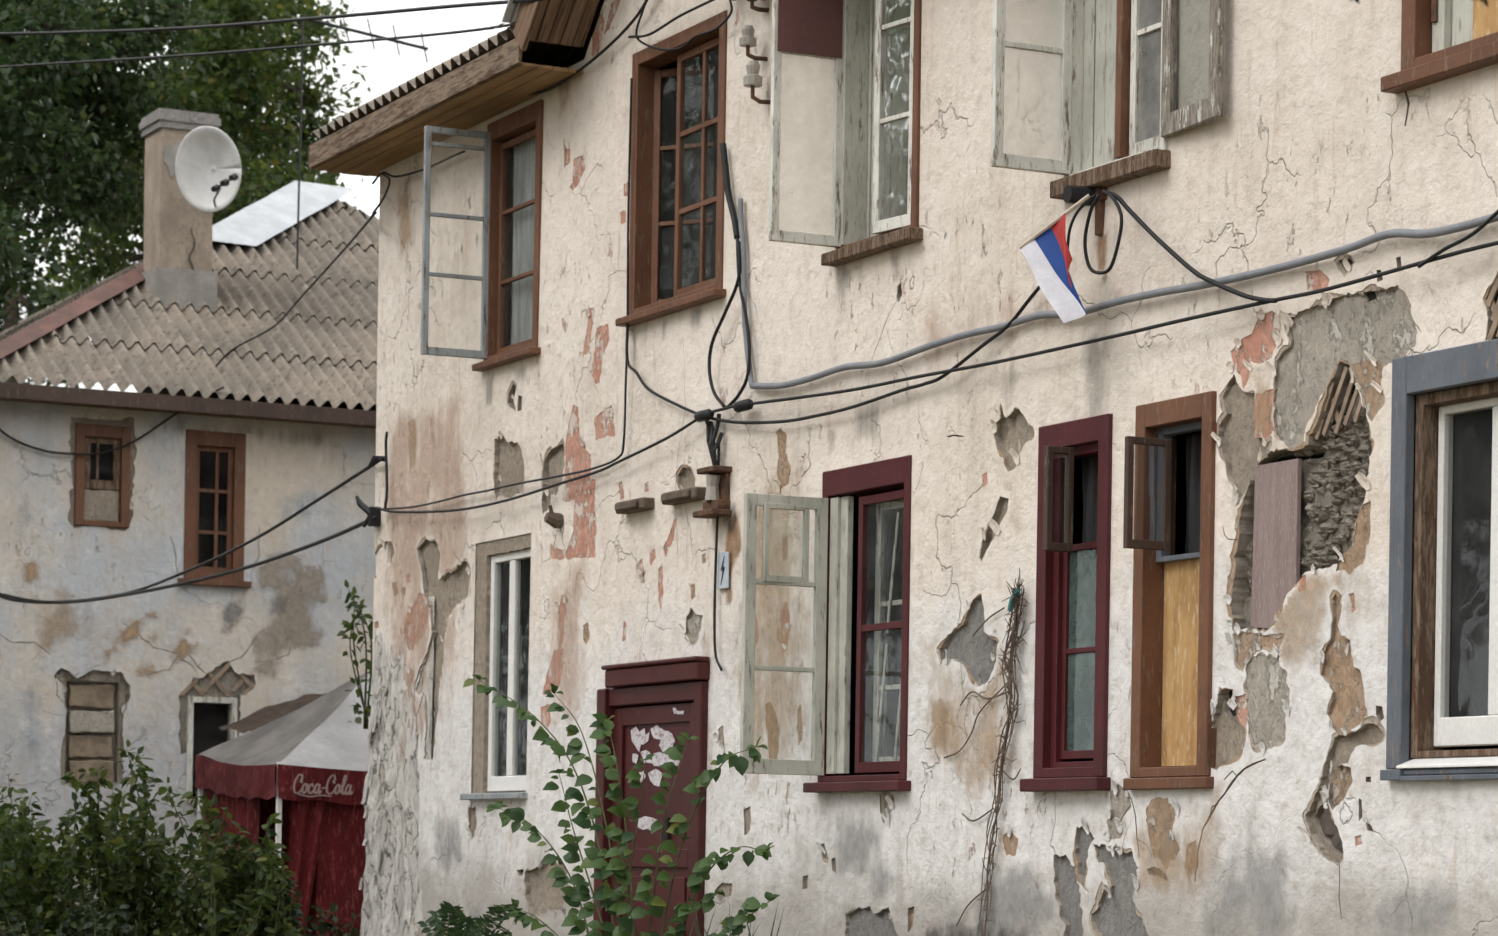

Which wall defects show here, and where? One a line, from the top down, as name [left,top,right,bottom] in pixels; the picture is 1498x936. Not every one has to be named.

peeling [493,405,615,561]
peeling [636,519,676,611]
peeling [979,472,1009,562]
peeling [989,403,1034,472]
spalling [1210,253,1417,866]
peeling [178,555,326,754]
peeling [374,537,471,760]
peeling [936,593,999,687]
peeling [815,842,836,873]
peeling [1053,777,1199,936]
peeling [844,906,915,936]